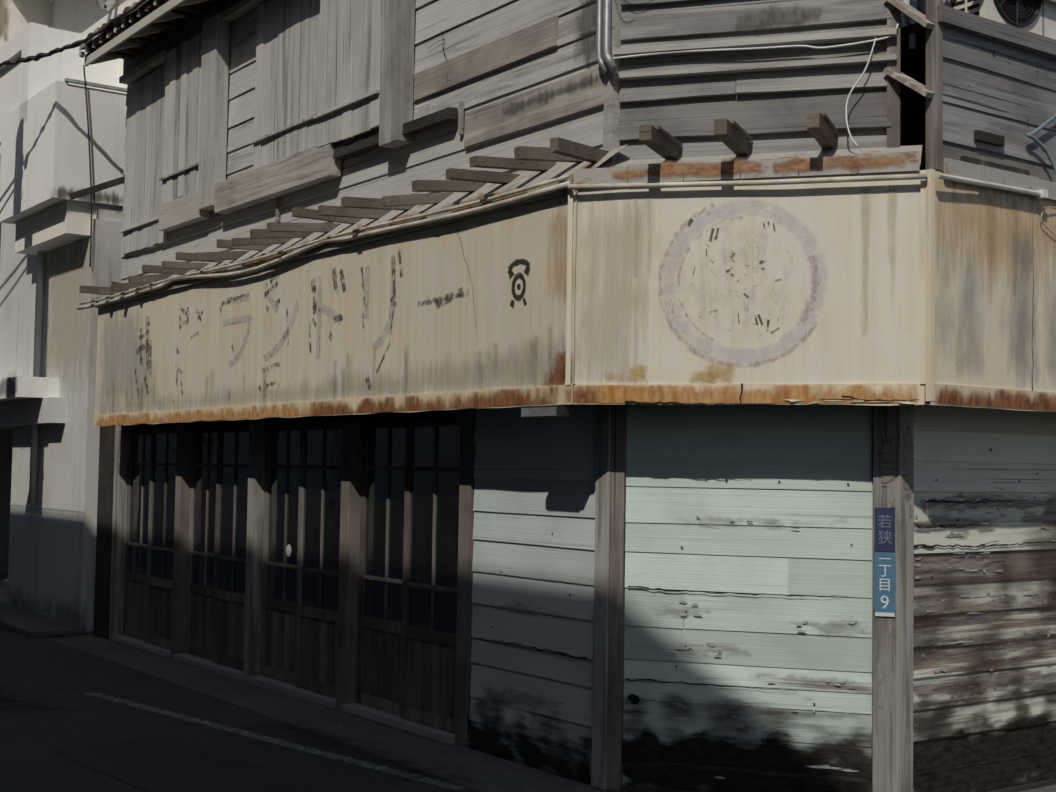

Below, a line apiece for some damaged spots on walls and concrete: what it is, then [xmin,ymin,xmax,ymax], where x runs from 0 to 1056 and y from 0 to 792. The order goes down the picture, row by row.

corrosion [614,159,760,178]
corrosion [774,156,904,172]
corrosion [97,352,913,425]
corrosion [937,387,1056,411]
peeling [891,426,1056,541]
peeling [914,551,1007,579]
water stain [467,697,592,784]
water stain [621,701,873,792]
water stain [913,673,1056,792]